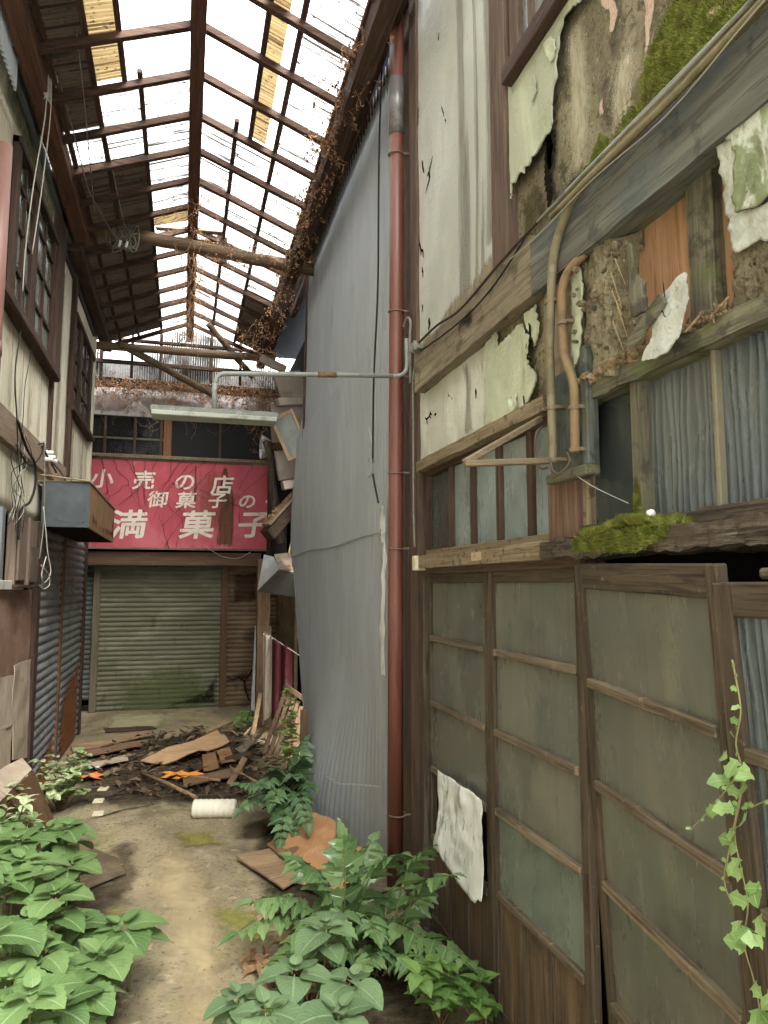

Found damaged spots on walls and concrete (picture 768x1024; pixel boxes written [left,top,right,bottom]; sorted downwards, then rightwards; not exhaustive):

flaking render [600,0,618,32]
flaking render [644,0,654,55]
flaking render [508,0,582,199]
damp [569,26,588,192]
damp [614,55,631,128]
crack [543,129,556,212]
flaking render [716,103,768,308]
flaking render [484,304,540,425]